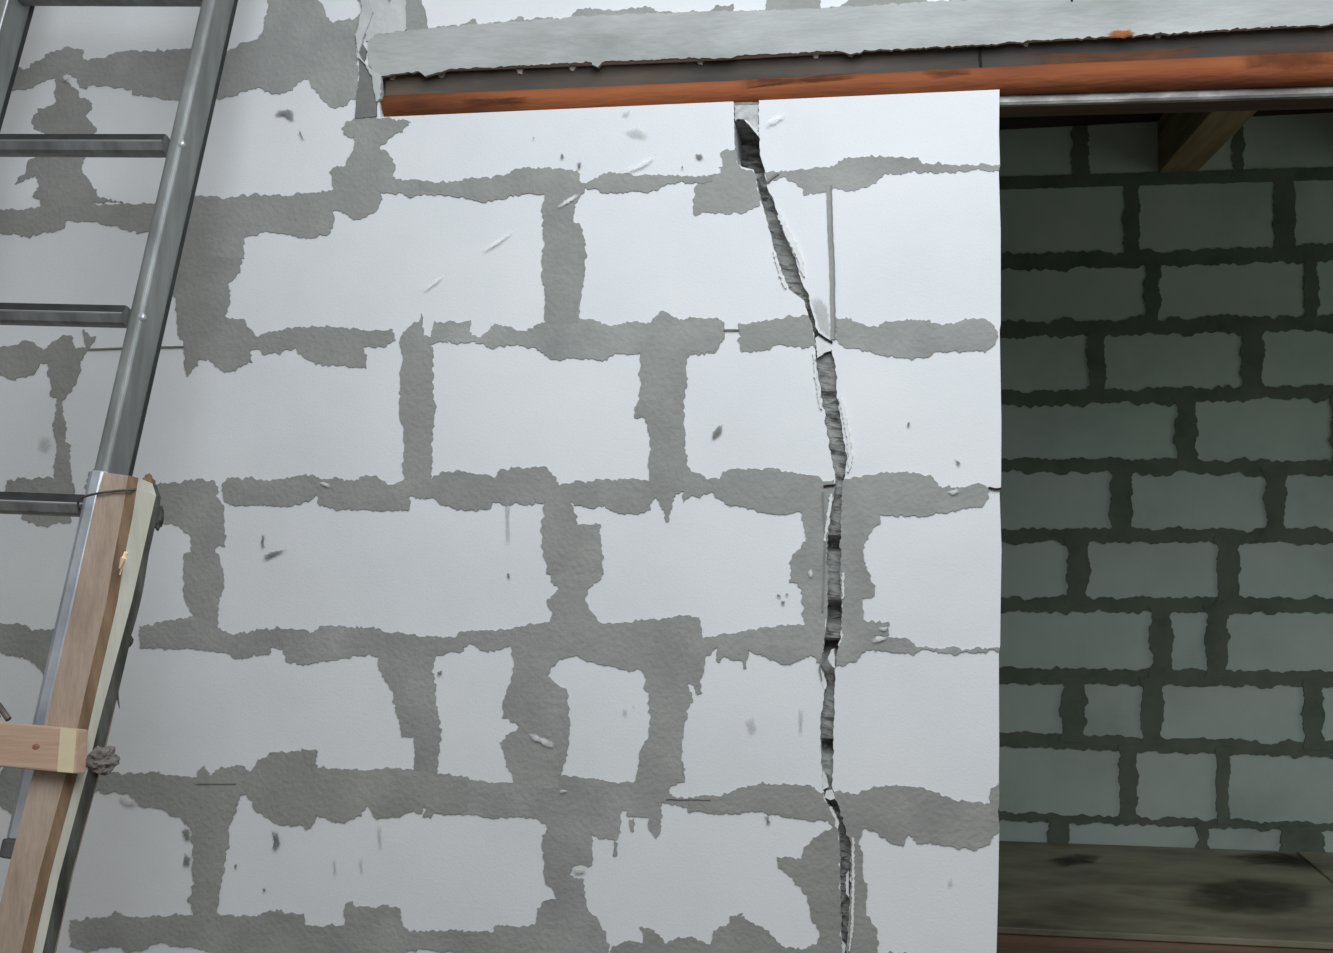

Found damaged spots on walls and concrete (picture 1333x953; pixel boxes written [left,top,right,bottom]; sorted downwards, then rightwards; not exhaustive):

crack [733,101,855,953]